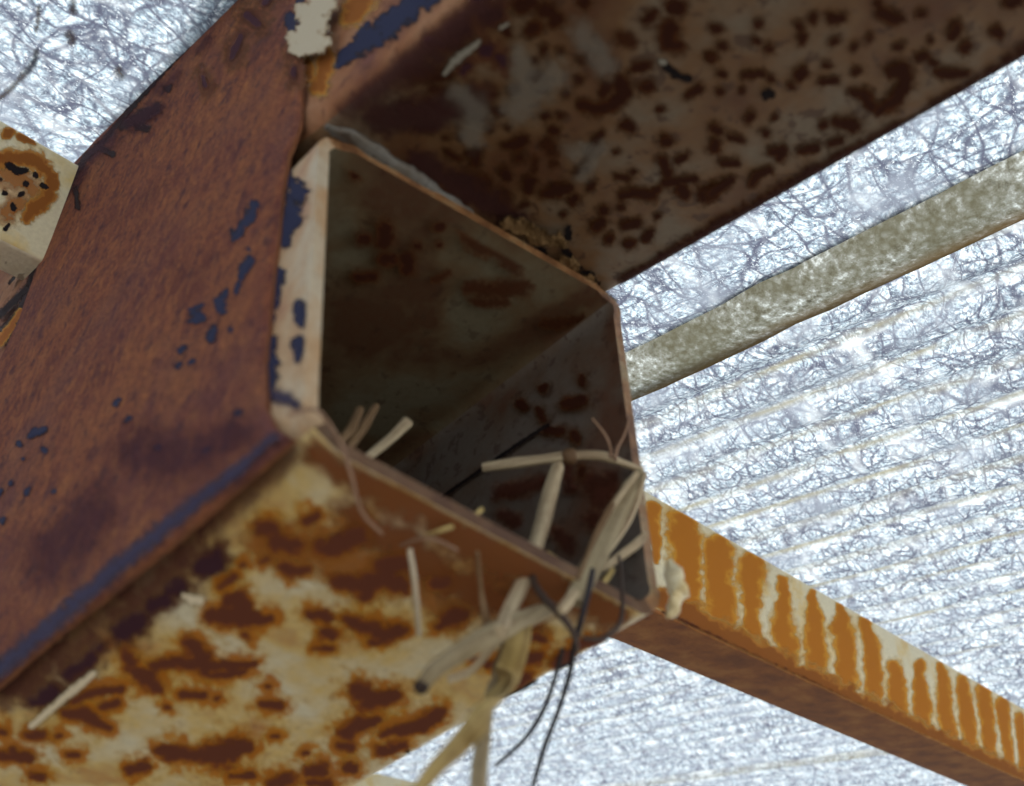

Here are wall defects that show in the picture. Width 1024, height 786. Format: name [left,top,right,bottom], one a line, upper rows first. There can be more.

corrosion [0,269,36,347]
corrosion [0,56,181,225]
peeling [186,199,260,344]
peeling [268,267,306,410]
peeling [281,163,312,249]
corrosion [305,46,335,97]
peeling [283,0,441,90]
corrosion [336,0,704,229]
corrosion [590,35,1024,284]
corrosion [792,11,873,51]
corrosion [0,438,631,786]
corrosion [646,500,1024,781]